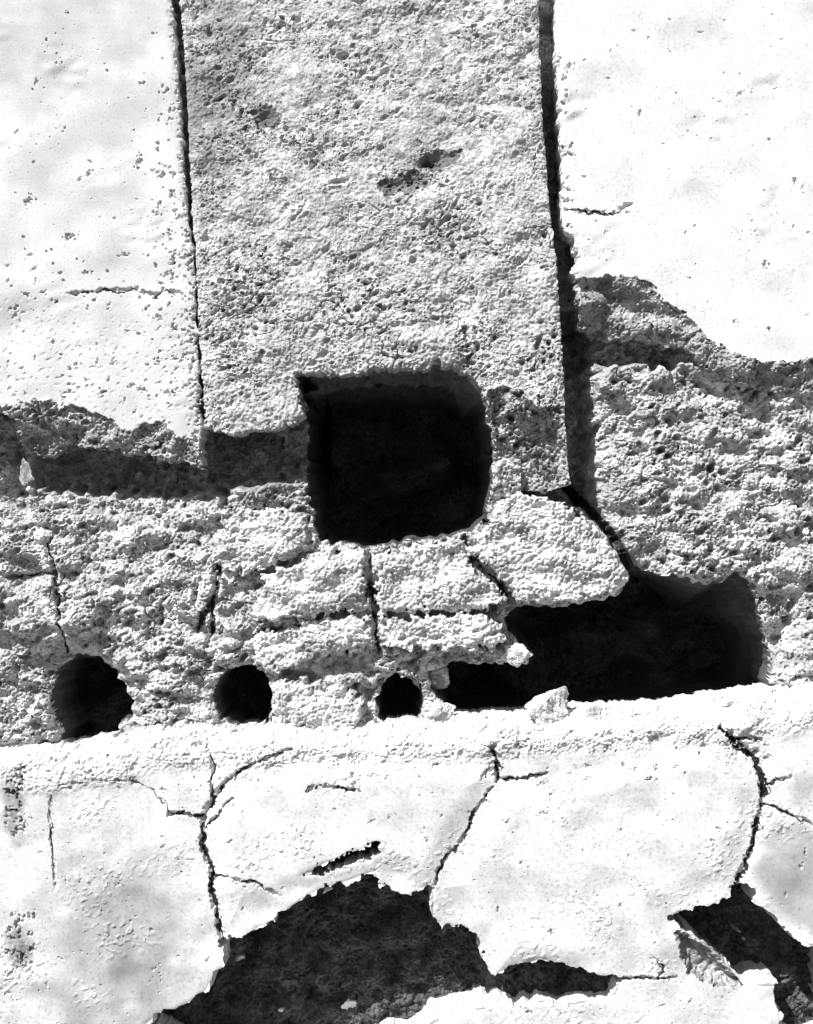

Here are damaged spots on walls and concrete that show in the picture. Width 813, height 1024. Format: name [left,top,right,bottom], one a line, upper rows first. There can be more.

spalling [571,274,813,394]
crack [3,542,69,654]
spalling [0,397,316,520]
crack [193,564,221,666]
spalling [485,386,567,495]
crack [561,485,635,573]
spalling [427,566,771,710]
crack [48,743,284,940]
crack [433,747,544,888]
crack [719,727,807,889]
spalling [162,873,613,1024]
spalling [673,883,813,1024]